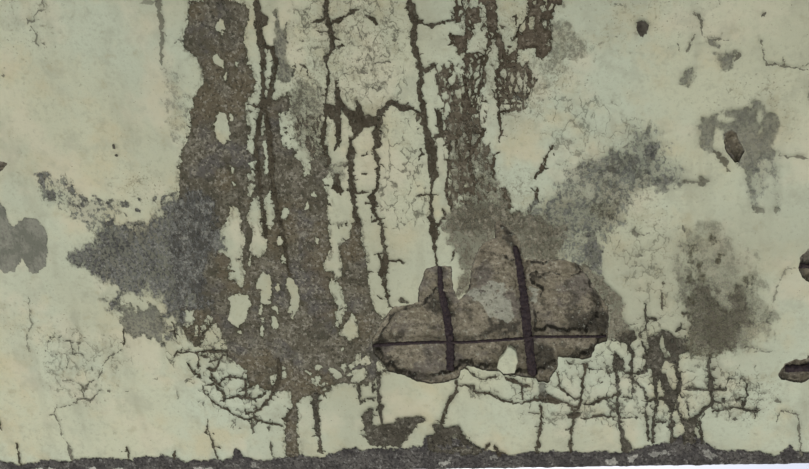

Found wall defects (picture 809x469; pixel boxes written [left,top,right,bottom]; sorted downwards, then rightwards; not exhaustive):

crack [155,0,182,65]
peeling [0,203,48,274]
water stain [34,172,88,219]
water stain [66,0,387,458]
crack [247,0,455,308]
water stain [434,0,761,453]
water stain [698,101,780,214]
spalling [798,249,809,282]
crack [163,316,292,459]
spalling [356,220,609,457]
crack [436,352,619,454]
spalling [778,355,809,383]